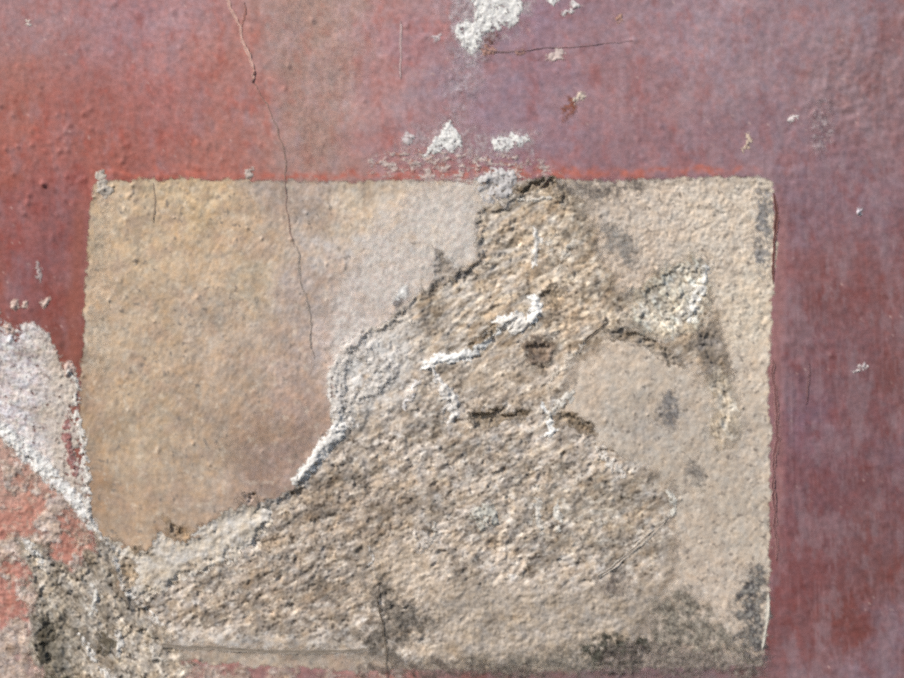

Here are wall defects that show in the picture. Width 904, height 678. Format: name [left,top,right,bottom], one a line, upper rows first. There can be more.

peeling [455,0,523,56]
peeling [545,48,566,61]
peeling [95,169,114,199]
crack [227,0,314,355]
flaking render [108,120,741,672]
peeling [0,437,96,637]
peeling [88,582,103,617]
peeling [78,632,116,678]